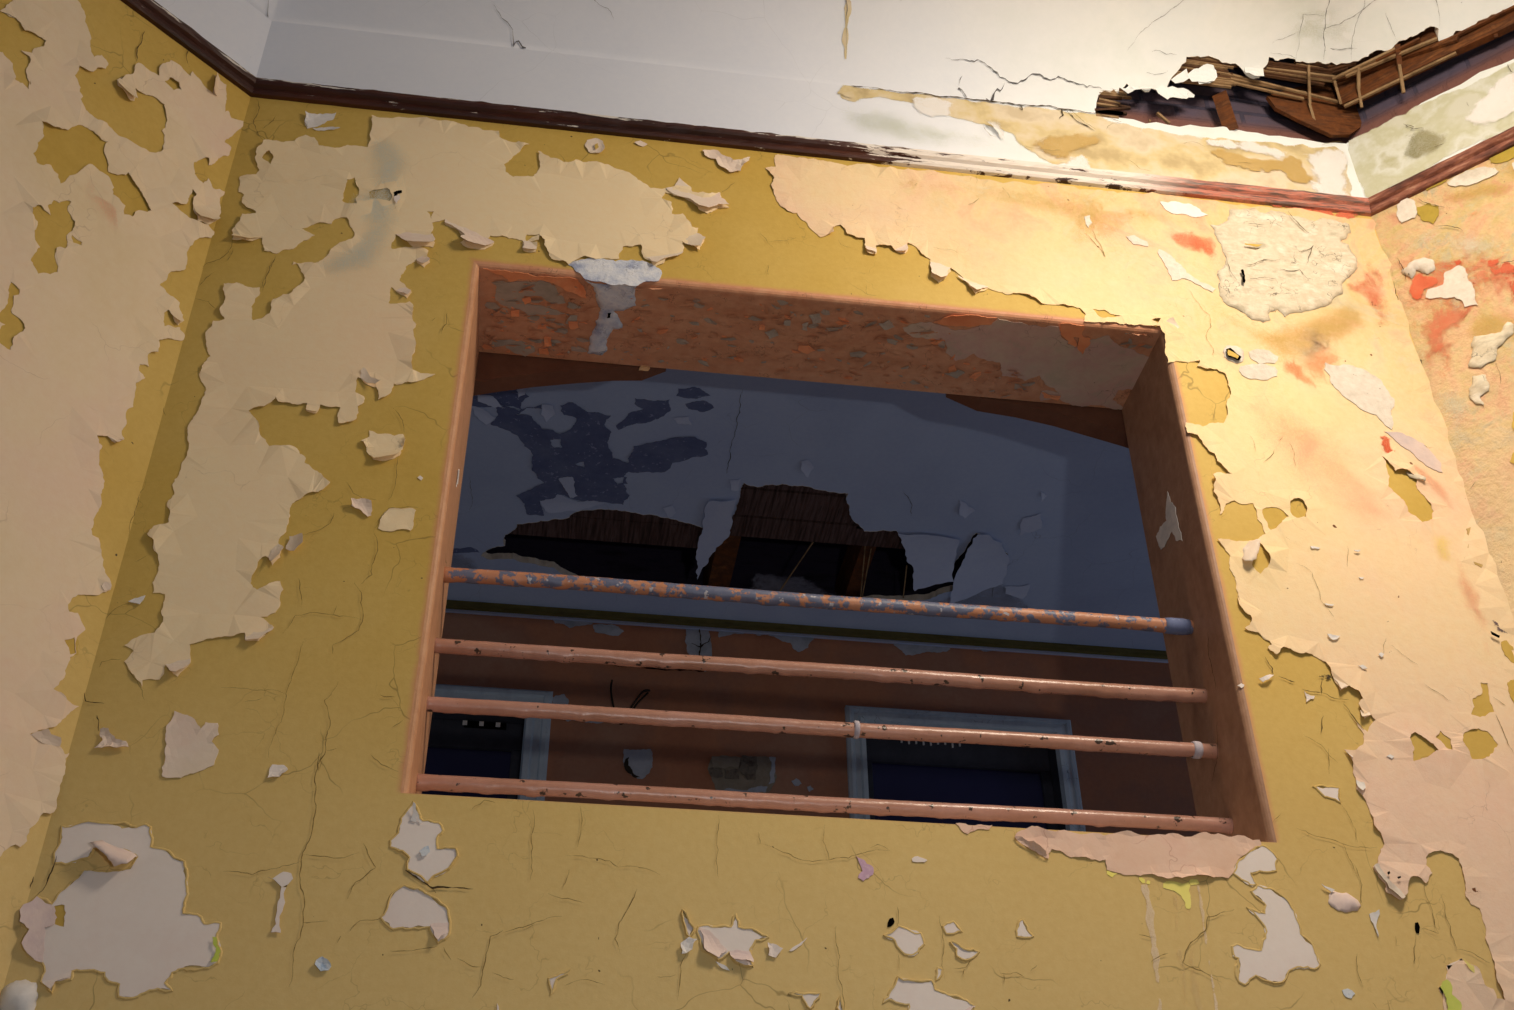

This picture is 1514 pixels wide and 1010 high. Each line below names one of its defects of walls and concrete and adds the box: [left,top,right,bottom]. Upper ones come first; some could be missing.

peeling [702,150,750,172]
crack [842,0,1121,151]
leakage [1032,133,1100,159]
peeling [0,0,729,1000]
flaking render [696,479,741,579]
peeling [759,63,1514,1010]
crack [230,408,469,977]
flaking render [685,629,814,656]
crack [402,808,660,994]
spalling [708,755,813,793]
crack [1139,911,1228,978]
crack [1265,657,1489,1009]